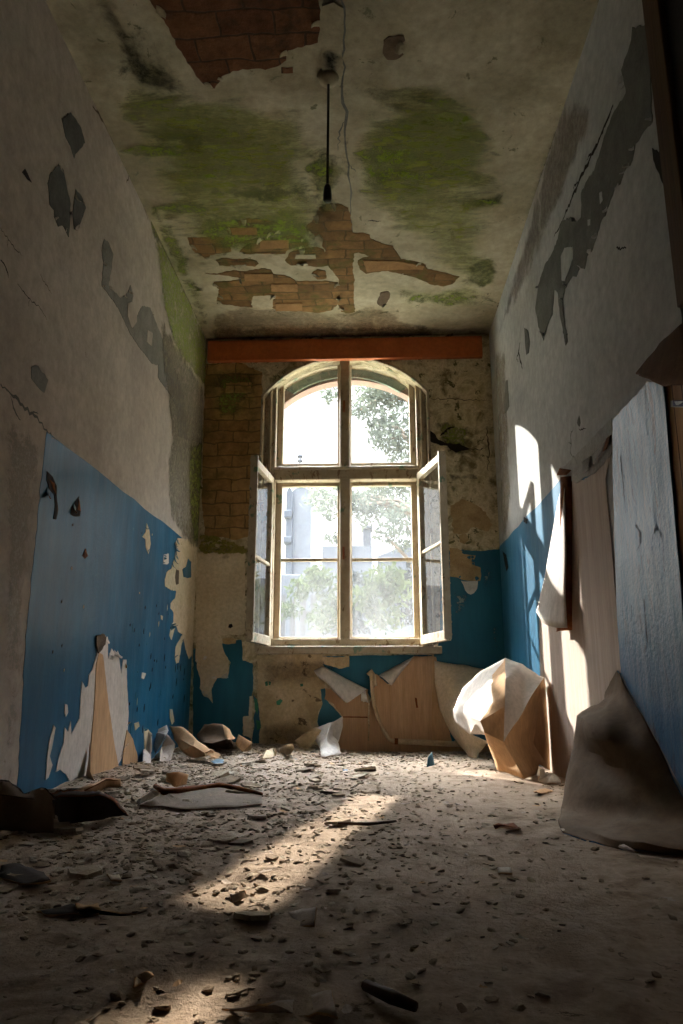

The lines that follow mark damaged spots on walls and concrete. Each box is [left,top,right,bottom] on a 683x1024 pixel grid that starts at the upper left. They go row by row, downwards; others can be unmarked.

flaking render [150,0,321,89]
spalling [48,163,86,237]
spalling [62,112,85,158]
crack [554,105,613,236]
spalling [524,25,653,355]
flaking render [187,203,460,313]
spalling [102,239,187,440]
crack [0,384,57,440]
flaking render [130,363,275,700]
peeling [440,548,481,594]
spalling [45,725,56,780]
spalling [121,709,174,757]